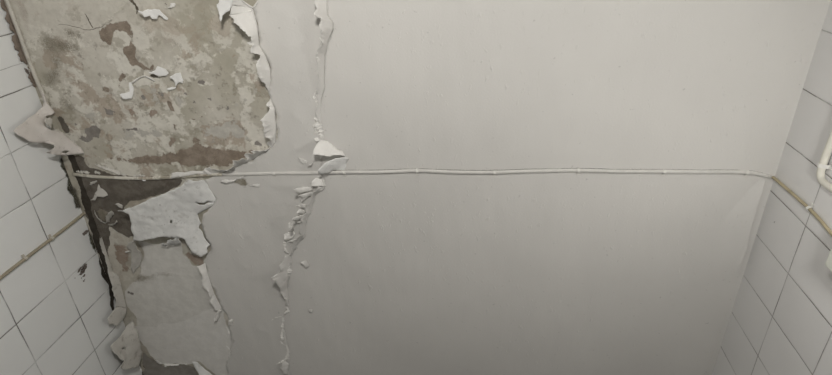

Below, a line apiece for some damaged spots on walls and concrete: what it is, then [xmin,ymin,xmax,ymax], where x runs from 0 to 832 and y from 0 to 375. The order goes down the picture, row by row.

damp [18,0,83,86]
damp [99,20,180,70]
flaking render [0,0,349,375]